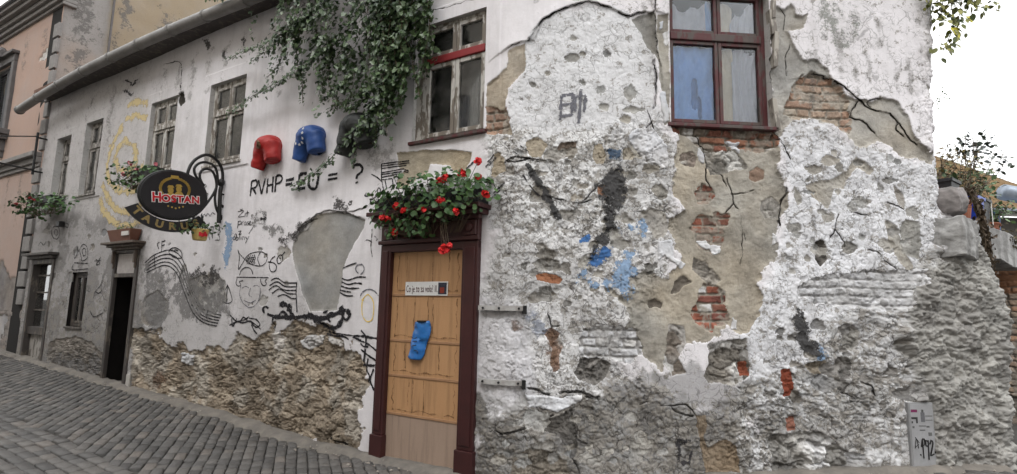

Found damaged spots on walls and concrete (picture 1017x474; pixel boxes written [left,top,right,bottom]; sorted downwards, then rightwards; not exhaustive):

crack [511,0,660,132]
crack [780,9,917,145]
crack [506,155,545,163]
spalling [485,4,935,385]
crack [695,136,752,262]
spalling [47,330,103,375]
spalling [130,212,370,449]
peeling [491,409,675,474]
peeling [763,317,868,431]
peeling [879,366,916,409]